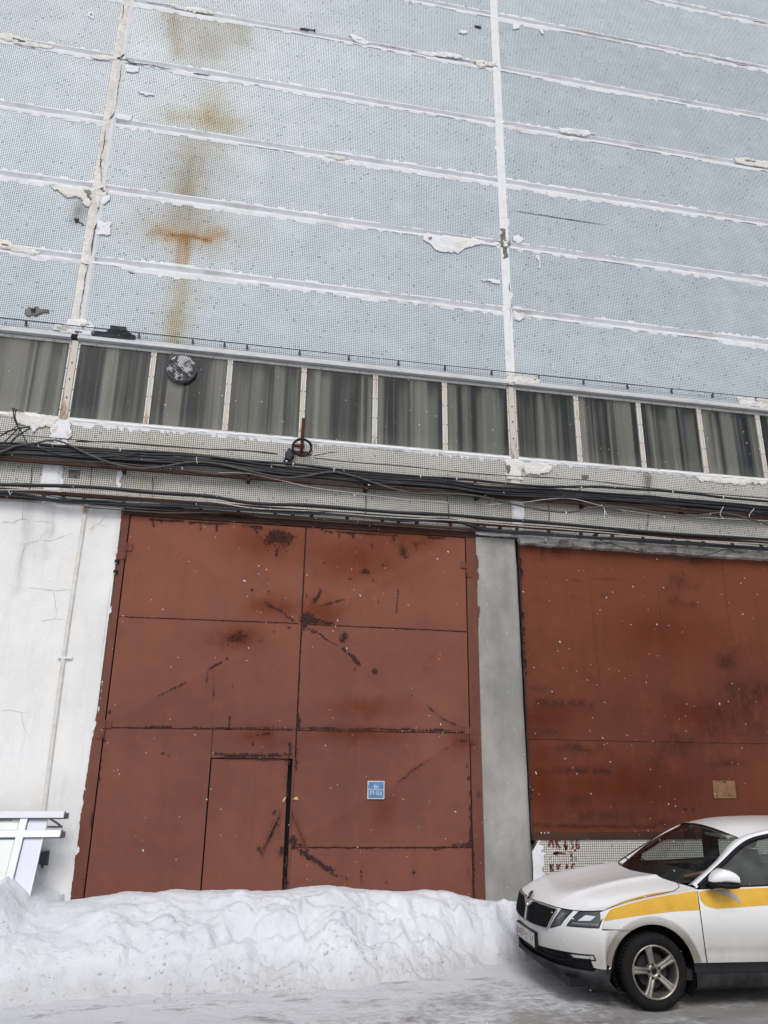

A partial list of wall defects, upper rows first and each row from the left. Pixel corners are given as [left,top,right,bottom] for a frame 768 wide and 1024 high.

peeling [57,185,110,205]
peeling [17,412,44,432]
corrosion [149,513,300,556]
corrosion [266,589,378,674]
corrosion [193,703,467,795]
corrosion [257,763,481,899]